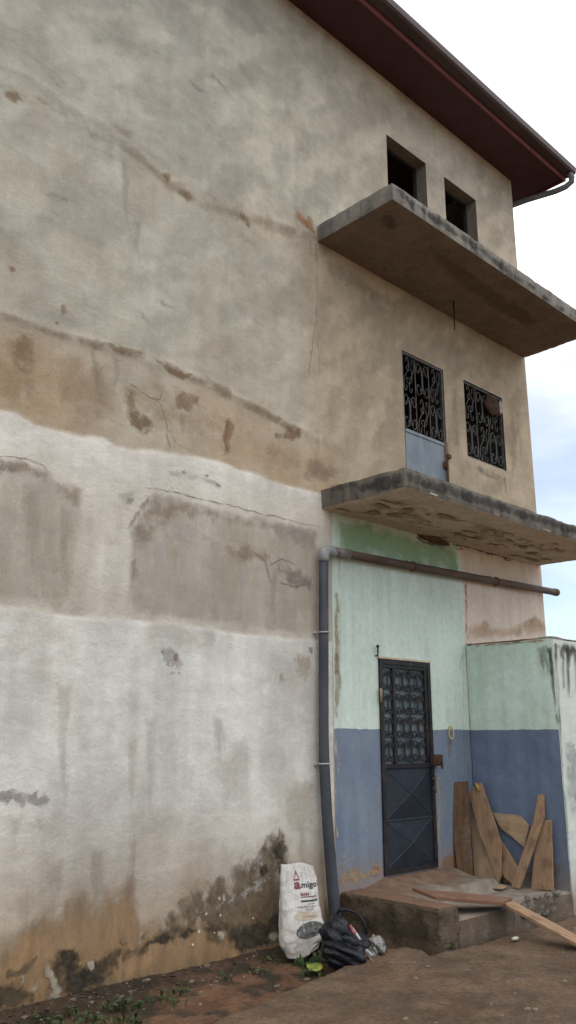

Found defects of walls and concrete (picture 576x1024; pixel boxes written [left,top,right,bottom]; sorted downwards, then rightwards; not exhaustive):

water stain [275,428,301,438]
crack [149,488,310,525]
peeling [335,500,563,562]
crack [255,553,309,587]
water stain [541,643,576,733]
water stain [0,830,287,1011]